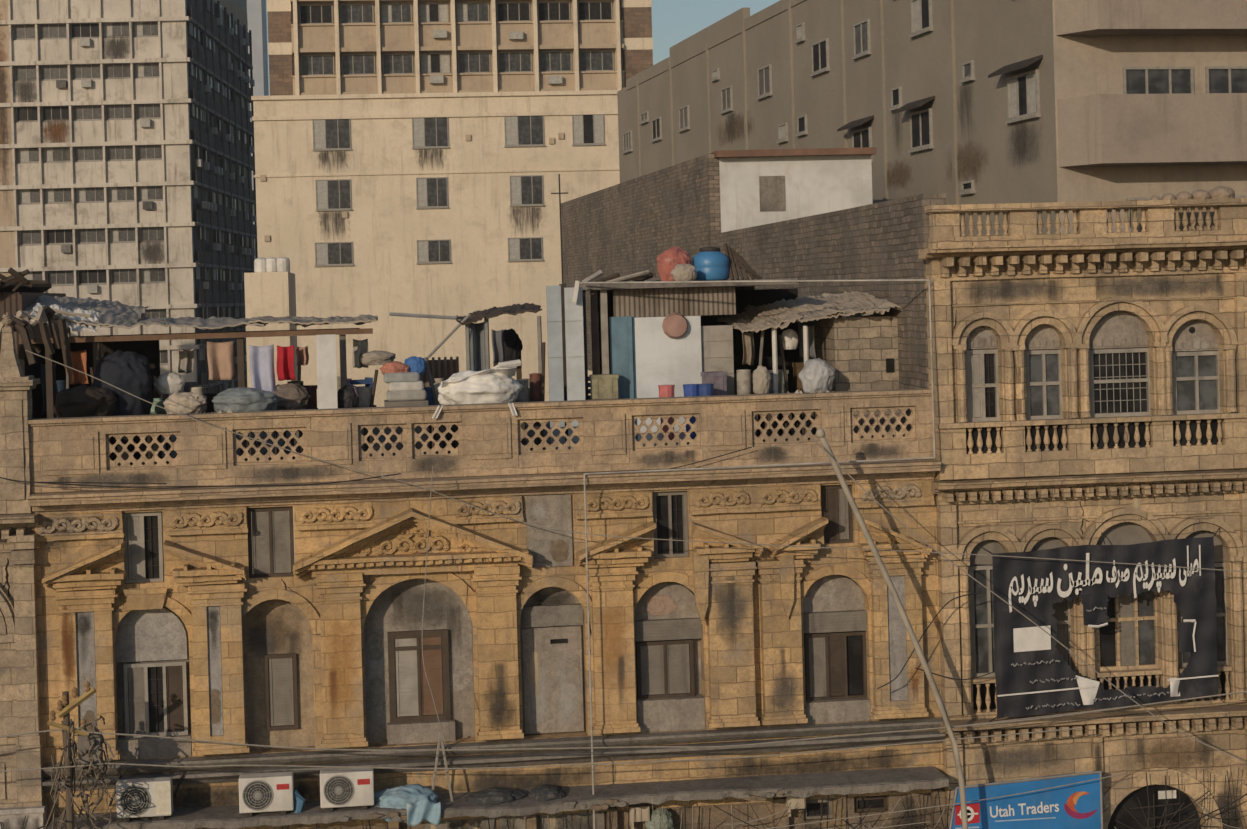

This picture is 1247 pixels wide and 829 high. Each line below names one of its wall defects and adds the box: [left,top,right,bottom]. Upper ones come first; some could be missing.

rust [64,608,72,675]
leakage [774,653,794,710]